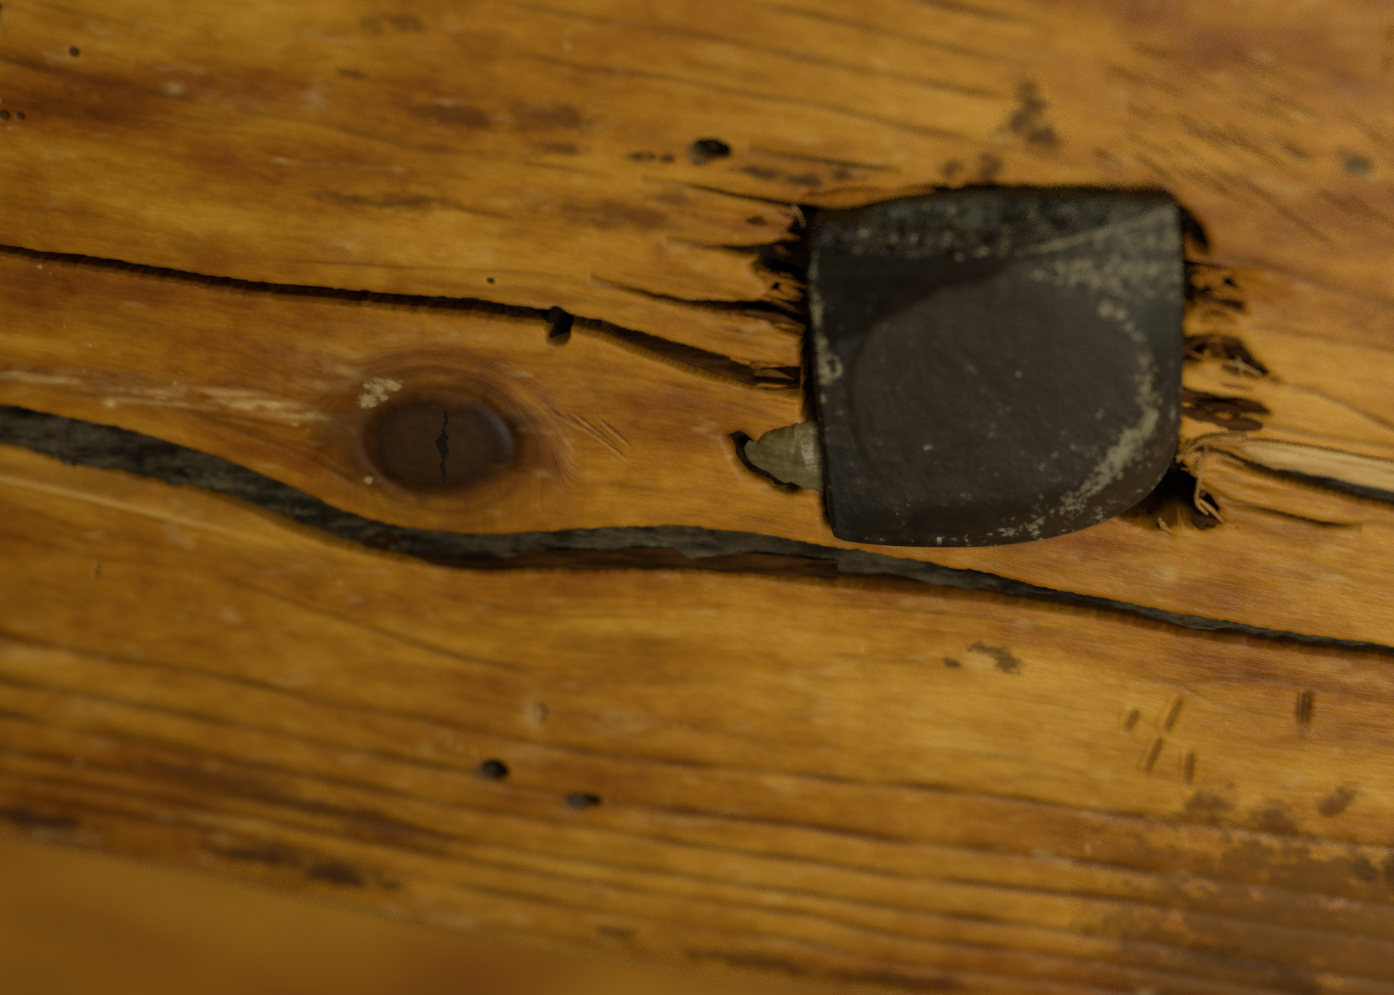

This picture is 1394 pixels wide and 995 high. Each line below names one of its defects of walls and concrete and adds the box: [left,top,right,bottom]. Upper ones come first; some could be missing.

crack [685,184,819,317]
crack [278,284,809,393]
crack [0,405,1394,655]